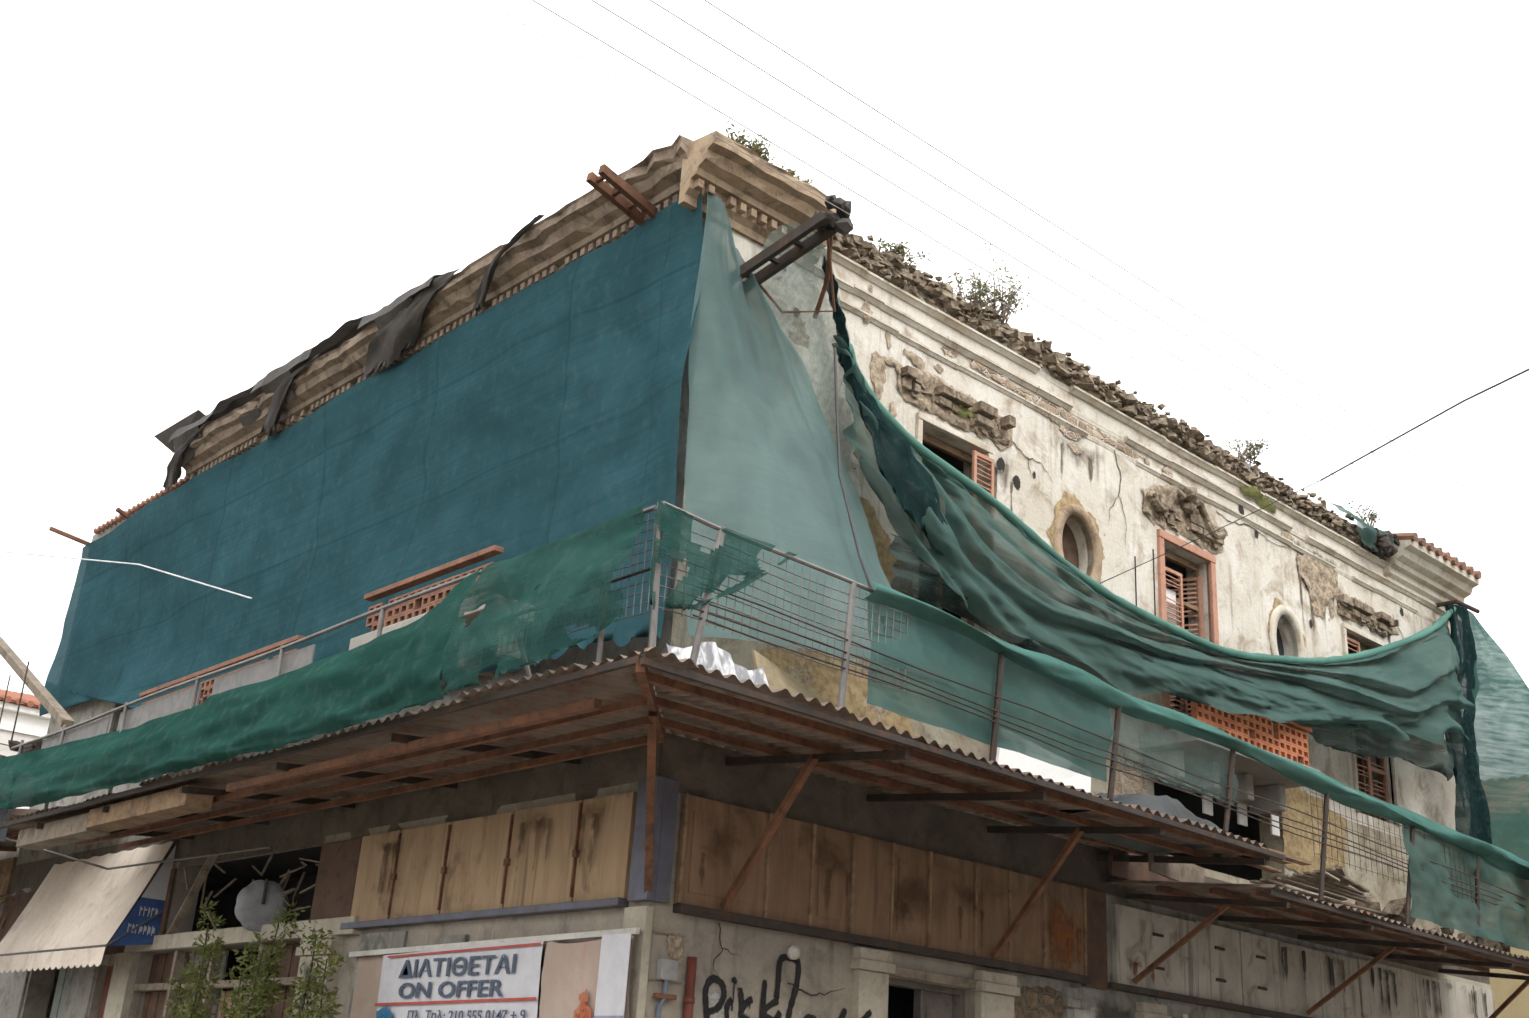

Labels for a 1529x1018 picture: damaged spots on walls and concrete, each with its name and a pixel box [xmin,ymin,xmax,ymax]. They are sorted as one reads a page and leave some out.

spalling [870,331,1223,560]
crack [1108,450,1127,537]
spalling [1268,598,1284,655]
spalling [1281,531,1375,646]
spalling [1014,986,1063,1018]